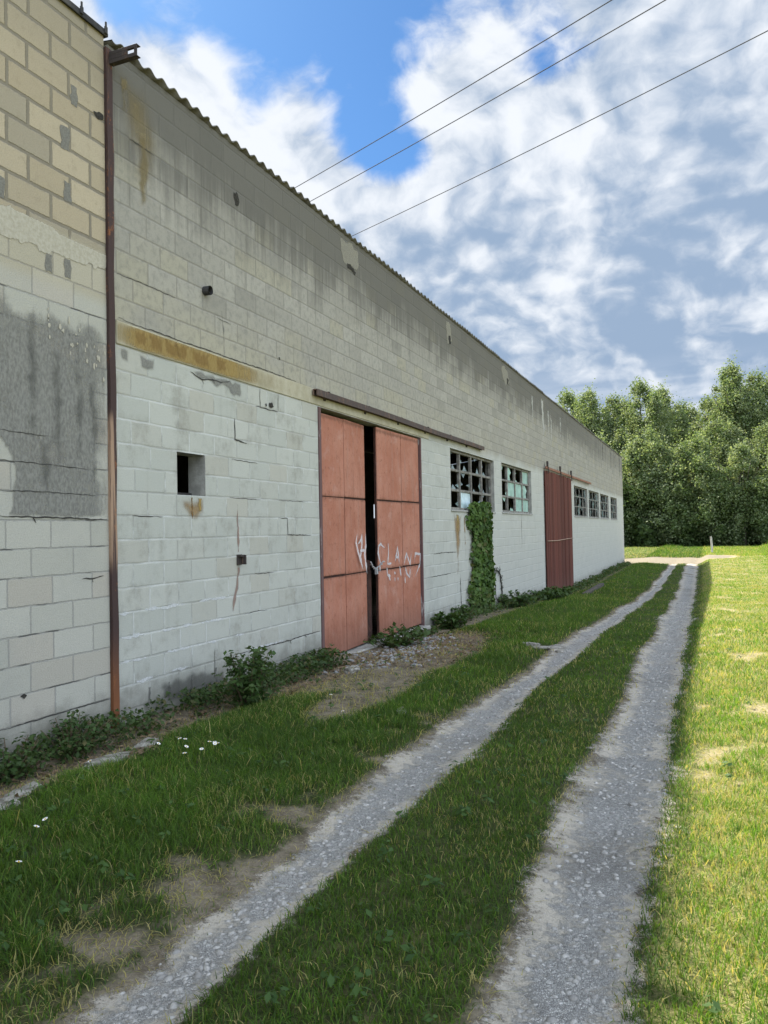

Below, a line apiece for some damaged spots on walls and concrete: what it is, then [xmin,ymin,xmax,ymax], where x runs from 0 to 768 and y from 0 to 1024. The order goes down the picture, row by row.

flaking render [0,205,106,269]
spalling [340,237,359,275]
corrosion [123,327,254,381]
spalling [197,372,241,395]
leakage [0,302,105,516]
corrosion [185,498,202,518]
corrosion [455,515,466,548]